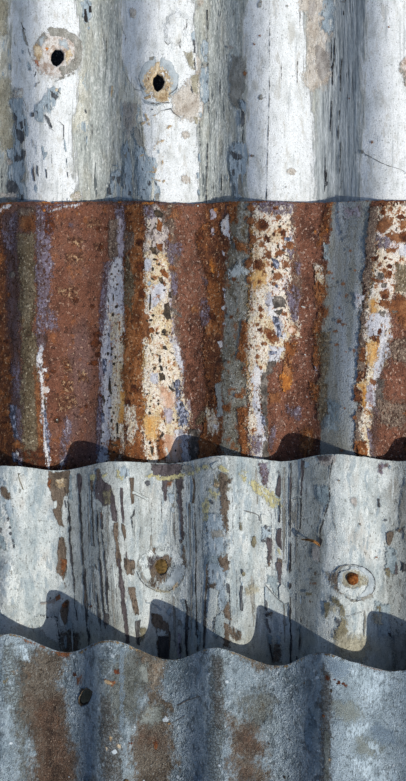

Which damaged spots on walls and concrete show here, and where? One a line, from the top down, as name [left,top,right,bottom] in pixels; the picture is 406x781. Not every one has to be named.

peeling [0,72,75,202]
peeling [80,0,93,30]
peeling [191,32,209,118]
peeling [226,45,255,200]
rust [0,201,196,470]
peeling [36,101,337,663]
rust [196,201,348,459]
rust [346,200,406,457]
rust [201,472,233,537]
peeling [385,483,406,578]
peeling [364,600,406,671]